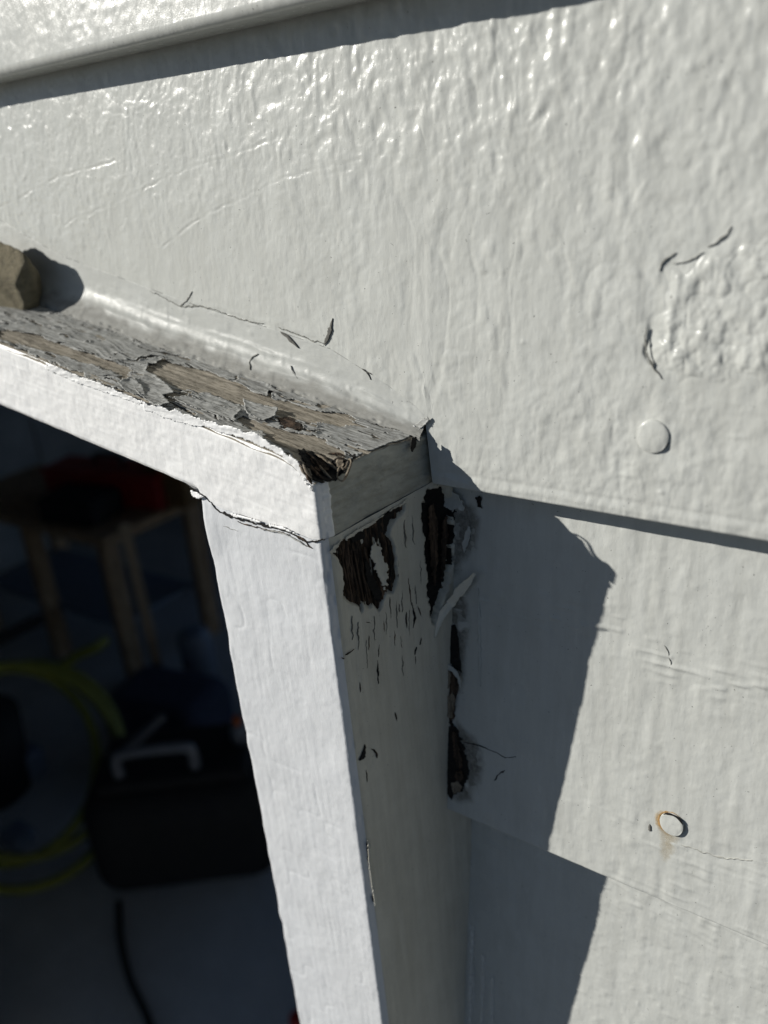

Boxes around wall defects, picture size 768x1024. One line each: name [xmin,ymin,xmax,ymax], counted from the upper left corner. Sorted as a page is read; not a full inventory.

crack [151,292,322,343]
peeling [0,306,429,488]
crack [189,487,325,549]
peeling [330,499,409,554]
peeling [370,542,421,647]
peeling [414,573,476,664]